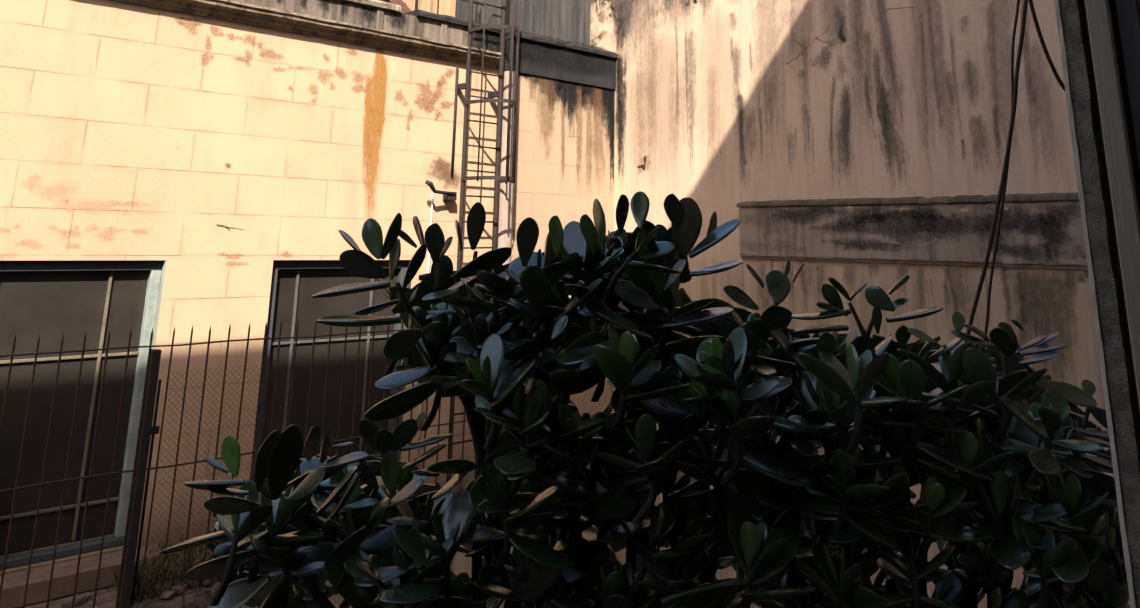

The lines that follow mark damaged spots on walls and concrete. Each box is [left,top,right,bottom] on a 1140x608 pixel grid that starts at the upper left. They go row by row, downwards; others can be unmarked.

corrosion [363,48,387,207]
flaking render [415,70,453,119]
leakage [473,0,677,177]
leakage [830,83,850,162]
leakage [866,0,904,172]
leakage [773,202,1075,262]